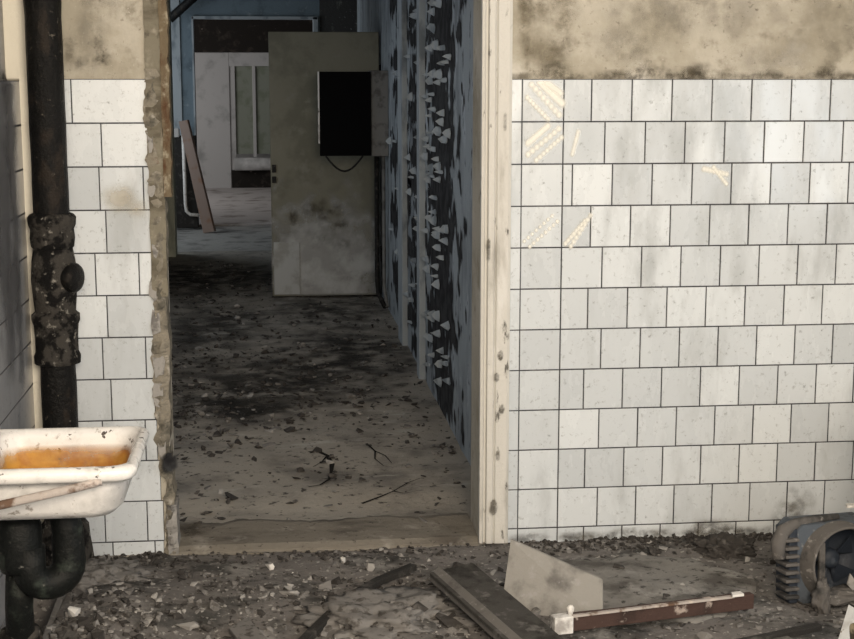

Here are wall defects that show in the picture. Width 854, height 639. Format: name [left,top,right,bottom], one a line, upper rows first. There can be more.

leakage [0,73,22,364]
spalling [143,69,181,555]
peeling [280,200,376,295]
peeling [386,0,467,446]
leakage [667,67,702,79]